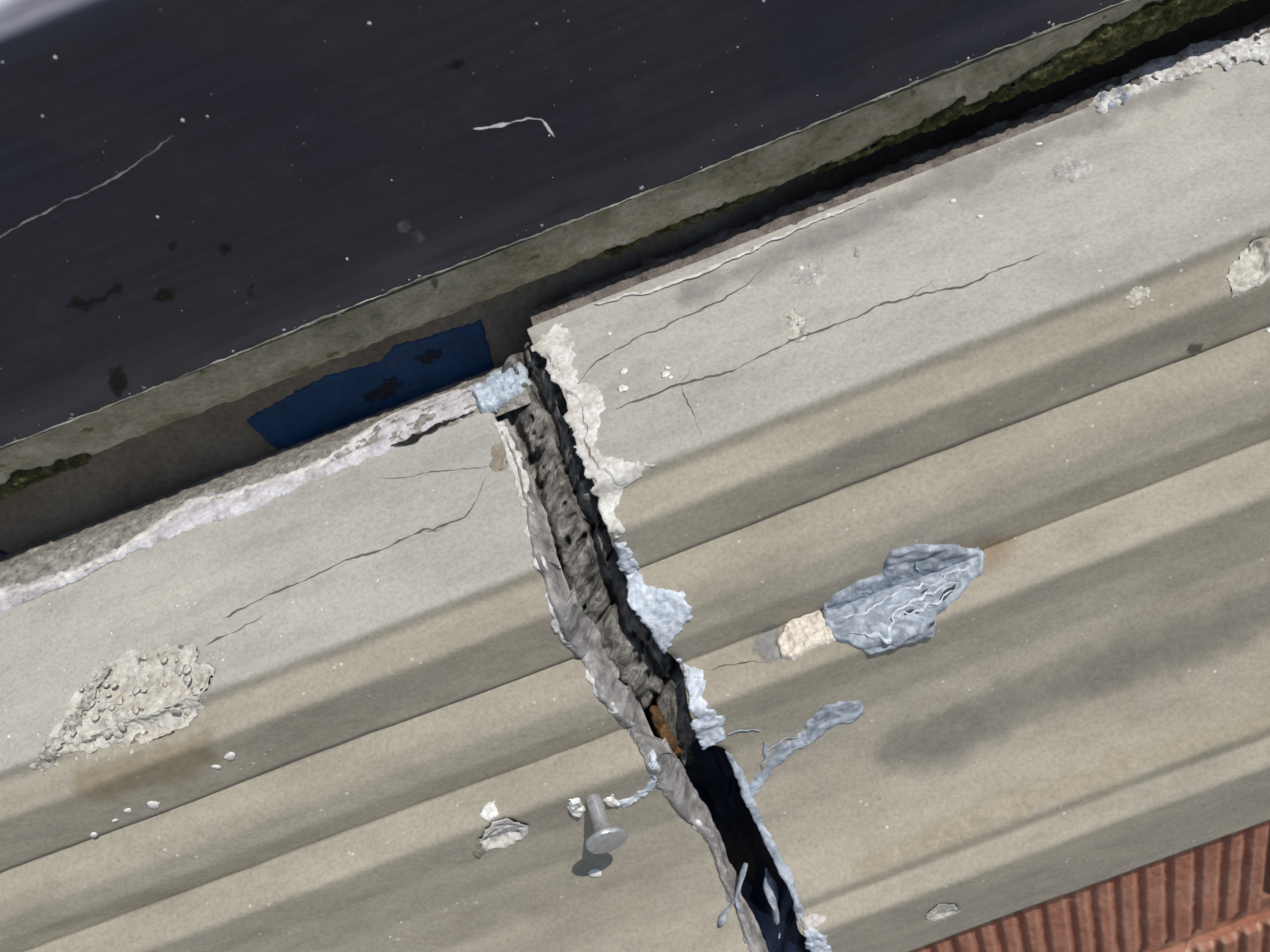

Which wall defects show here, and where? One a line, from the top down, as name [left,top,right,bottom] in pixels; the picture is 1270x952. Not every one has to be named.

peeling [1226,237,1270,298]
crack [391,411,474,446]
crack [545,268,764,493]
crack [617,254,1040,432]
crack [205,466,487,646]
spalling [29,643,215,776]
rust [649,705,684,757]